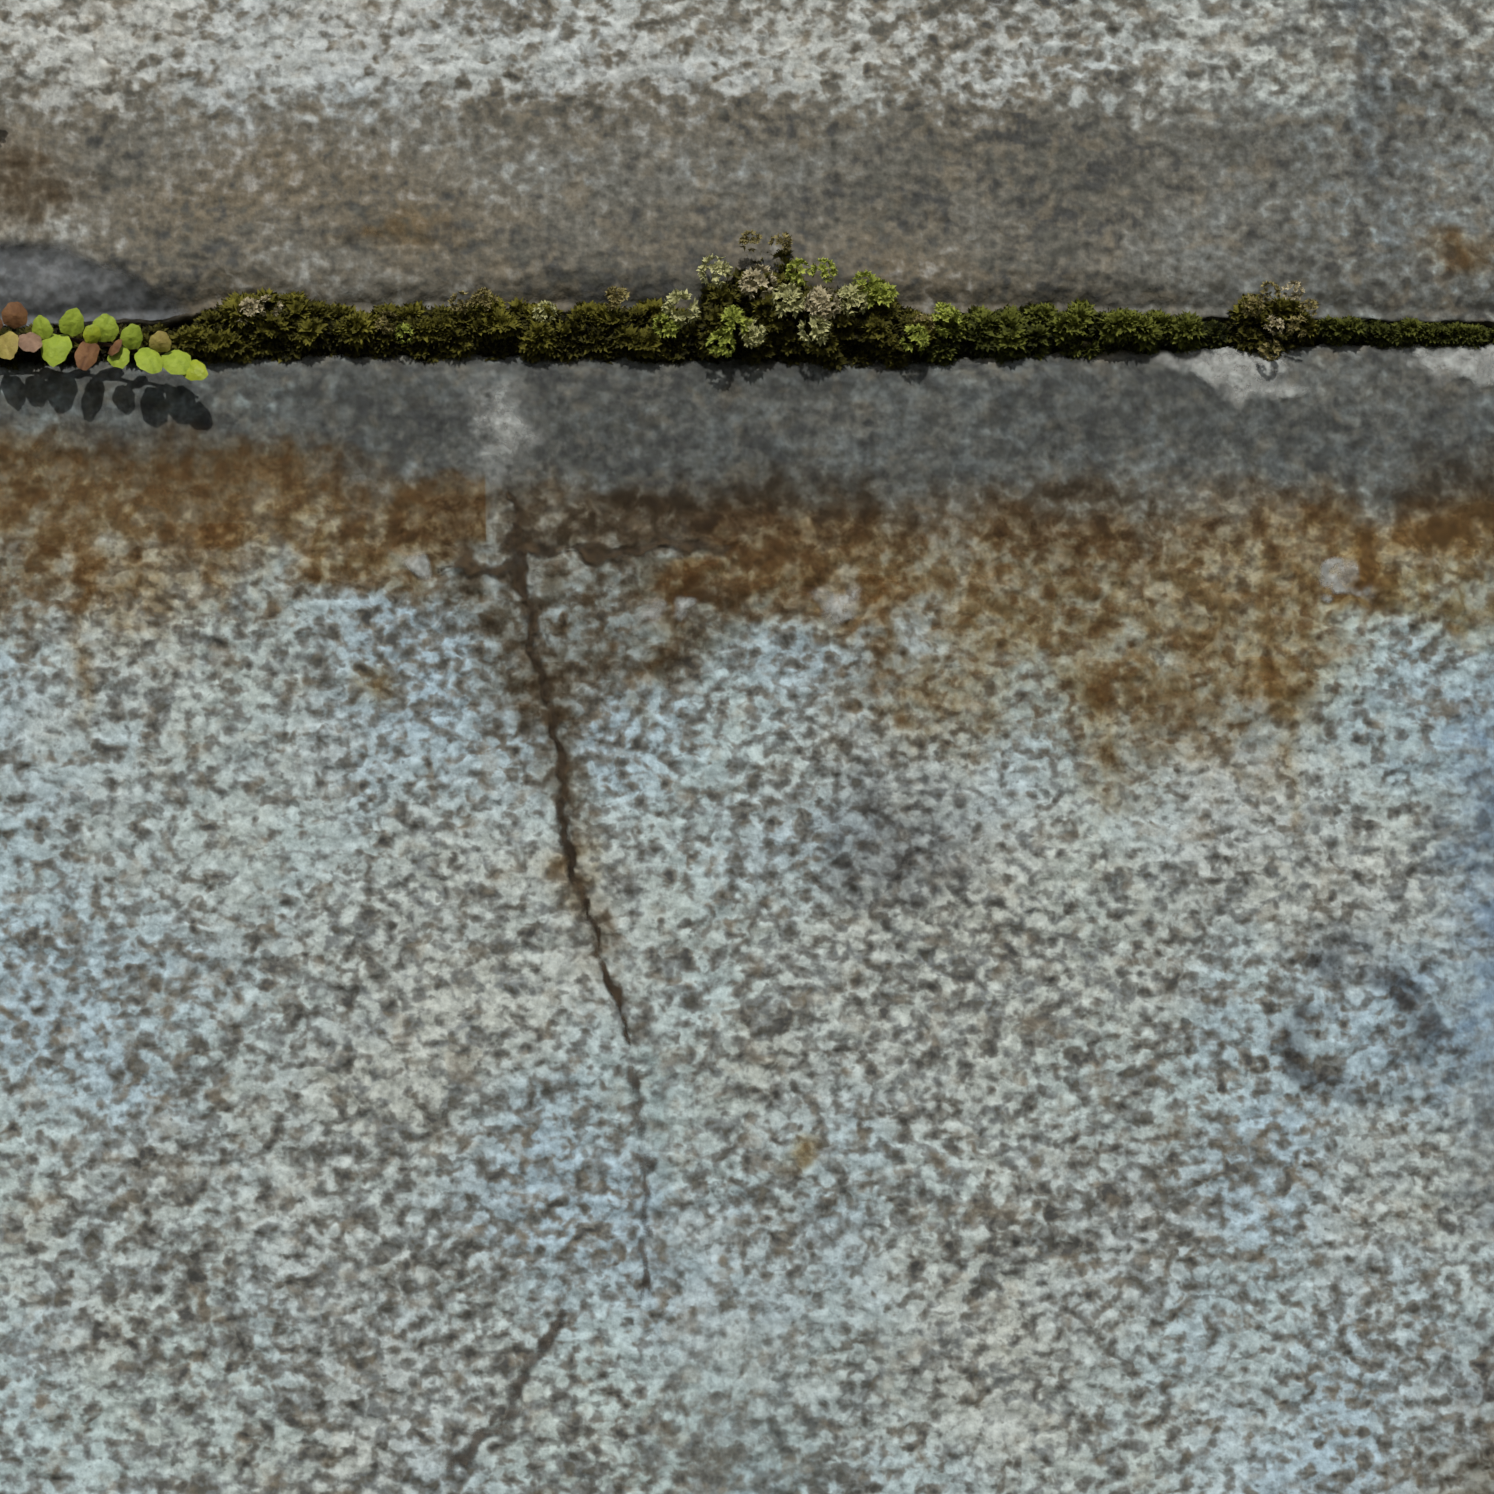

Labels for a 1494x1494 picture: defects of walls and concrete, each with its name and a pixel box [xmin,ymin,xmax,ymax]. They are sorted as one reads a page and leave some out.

crack [438,492,731,1295]
crack [446,1309,566,1470]